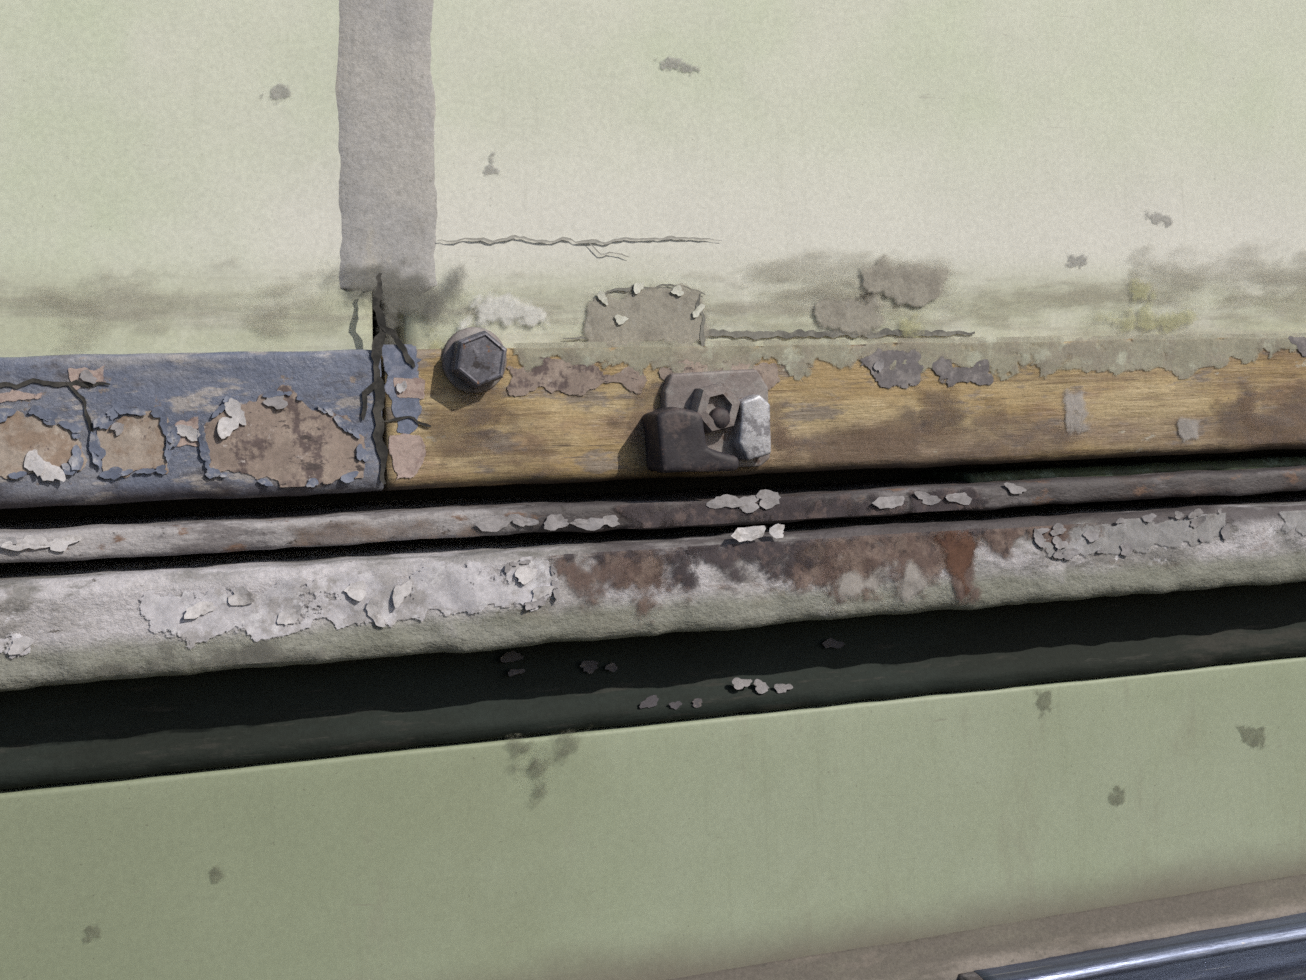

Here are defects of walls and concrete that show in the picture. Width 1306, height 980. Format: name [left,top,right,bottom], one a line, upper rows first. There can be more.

water stain [346,264,464,345]
water stain [460,294,546,330]
crack [437,235,975,346]
peeling [507,254,1306,396]
crack [0,378,110,433]
peeling [0,385,370,487]
crack [361,273,431,484]
peeling [138,556,560,649]
rust [549,549,680,622]
peeling [706,489,785,542]
rust [785,523,1091,602]
peeling [1033,508,1230,560]